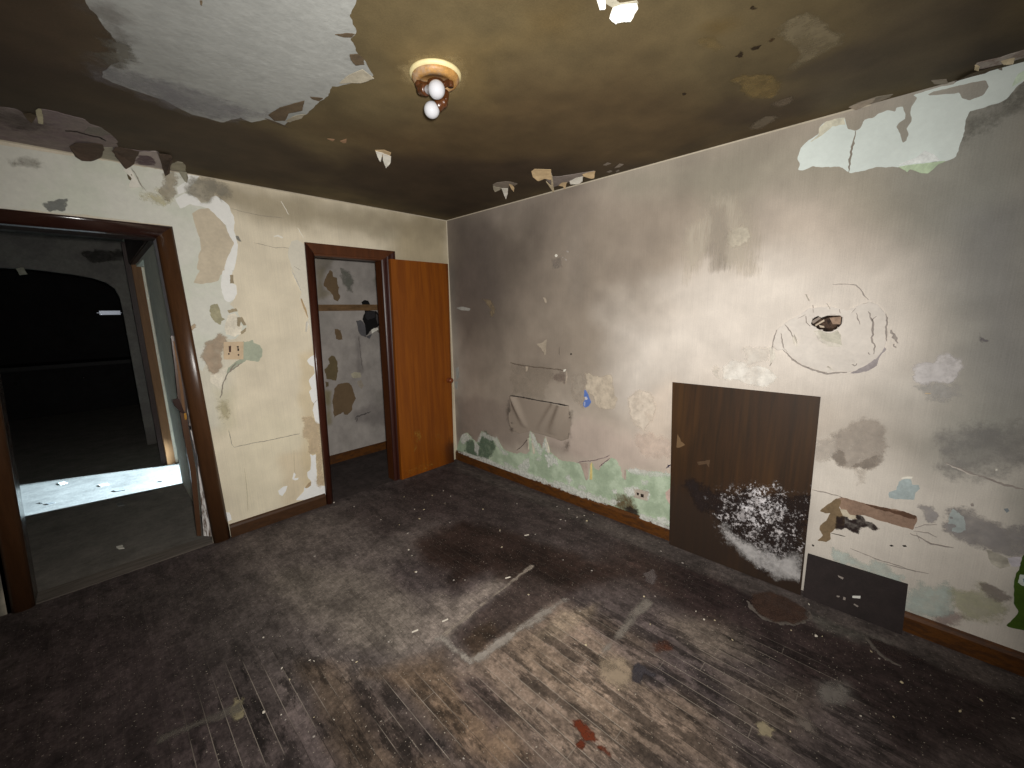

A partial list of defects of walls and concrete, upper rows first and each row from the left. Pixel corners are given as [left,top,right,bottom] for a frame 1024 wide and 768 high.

peeling [85,0,374,127]
peeling [797,50,1024,174]
peeling [493,181,517,198]
peeling [531,162,624,192]
peeling [0,107,263,389]
peeling [274,235,364,424]
spalling [356,300,380,339]
peeling [457,431,671,529]
water stain [816,421,885,471]
peeling [812,477,920,547]